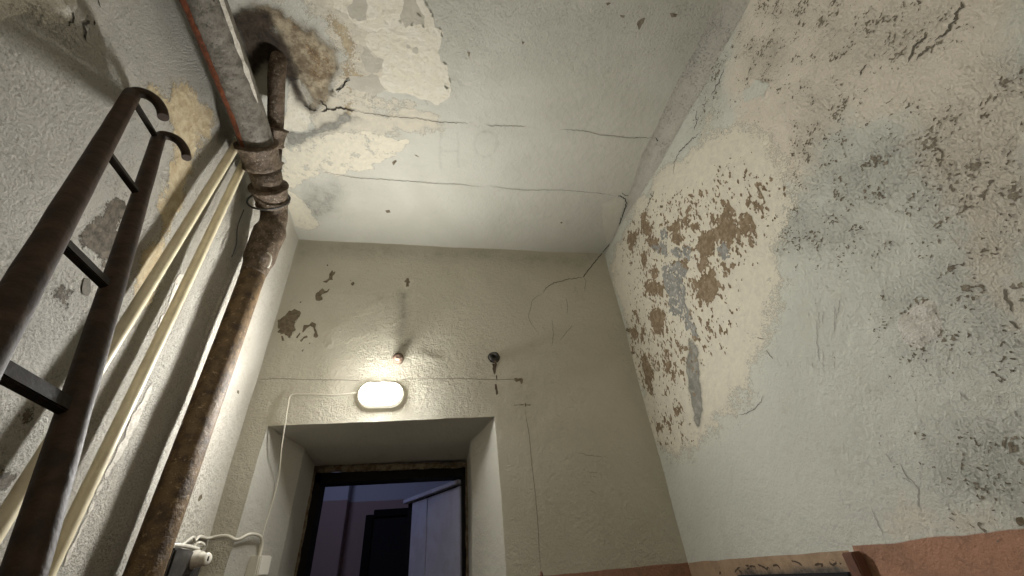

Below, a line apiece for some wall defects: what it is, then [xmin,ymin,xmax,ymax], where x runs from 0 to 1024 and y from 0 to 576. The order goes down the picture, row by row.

spalling [79,192,128,268]
damp [131,77,220,296]
corrosion [180,0,244,147]
spalling [278,301,318,352]
damp [255,6,363,145]
spalling [315,264,335,301]
peeling [282,0,451,231]
crack [304,79,467,124]
crack [331,173,654,343]
crack [561,69,724,171]
peeling [609,0,1024,466]
spalling [946,429,1024,533]